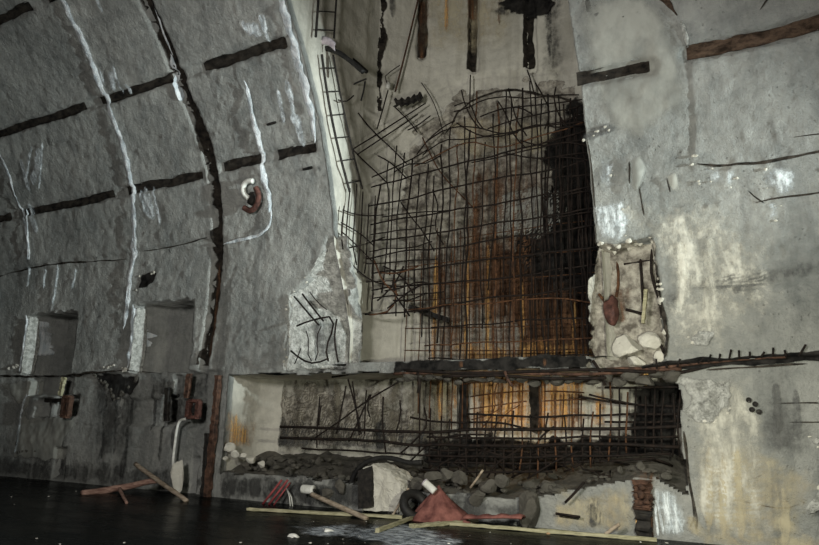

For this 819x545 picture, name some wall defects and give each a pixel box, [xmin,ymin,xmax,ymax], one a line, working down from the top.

crack [697,133,819,167]
crack [748,191,819,203]
crack [146,238,205,254]
spalling [279,0,787,479]
crack [0,259,125,277]
corrosion [394,247,592,428]